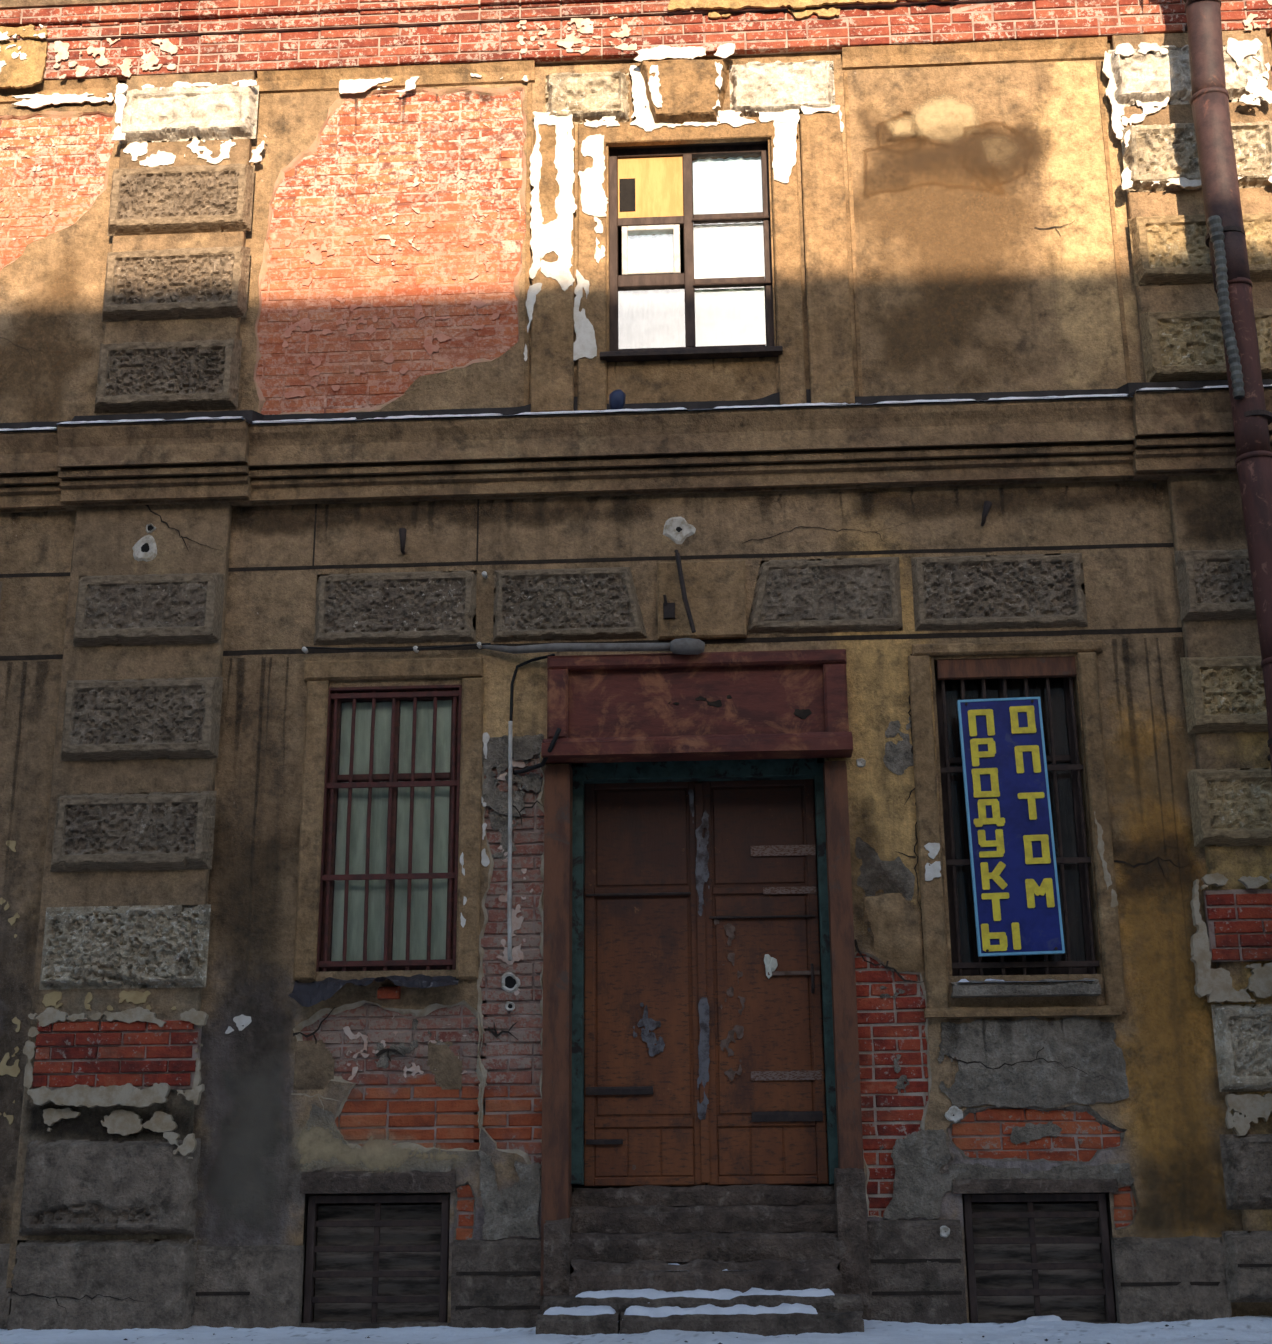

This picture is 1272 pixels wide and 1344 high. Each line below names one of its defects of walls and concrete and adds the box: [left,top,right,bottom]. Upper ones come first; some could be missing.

flaking render [0,24,257,271]
flaking render [253,43,844,415]
flaking render [668,0,950,20]
damp [854,98,1037,365]
peeling [1102,42,1169,148]
peeling [1121,167,1202,191]
peeling [1227,38,1272,106]
flaking render [293,732,544,1240]
flaking render [1190,872,1272,1003]
flaking render [0,990,209,1159]
flaking render [855,951,1129,1218]
spalling [1225,1093,1272,1136]